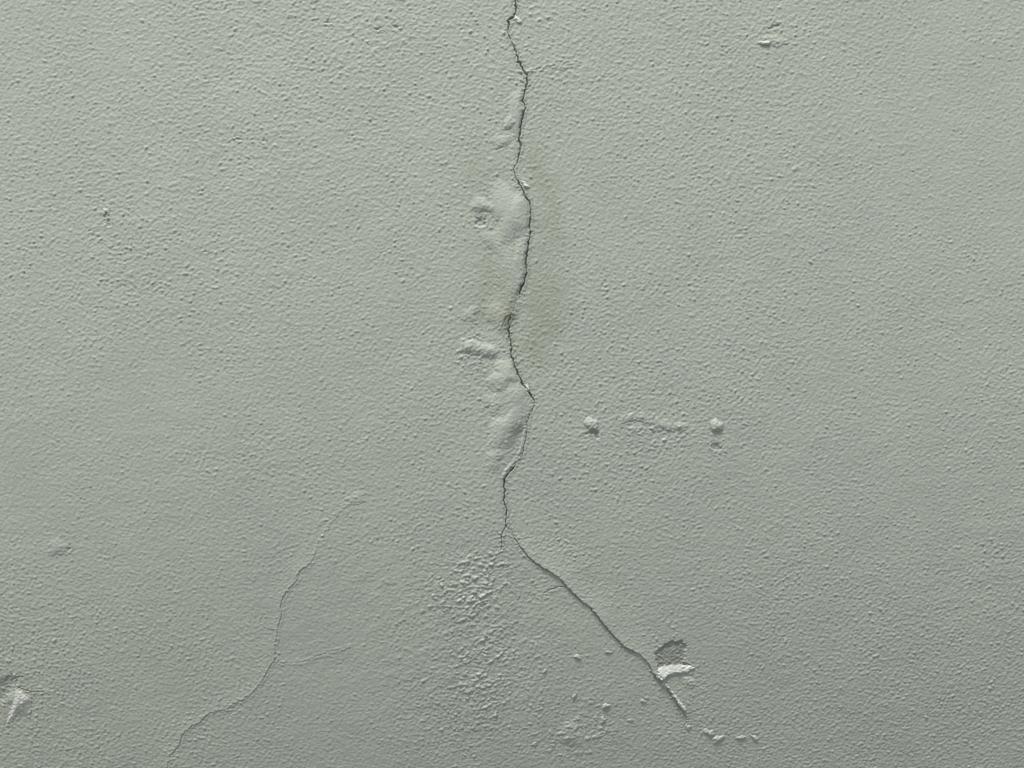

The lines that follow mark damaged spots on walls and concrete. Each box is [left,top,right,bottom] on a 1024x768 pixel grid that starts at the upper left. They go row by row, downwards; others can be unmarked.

crack [495,0,715,747]
spalling [652,637,697,689]